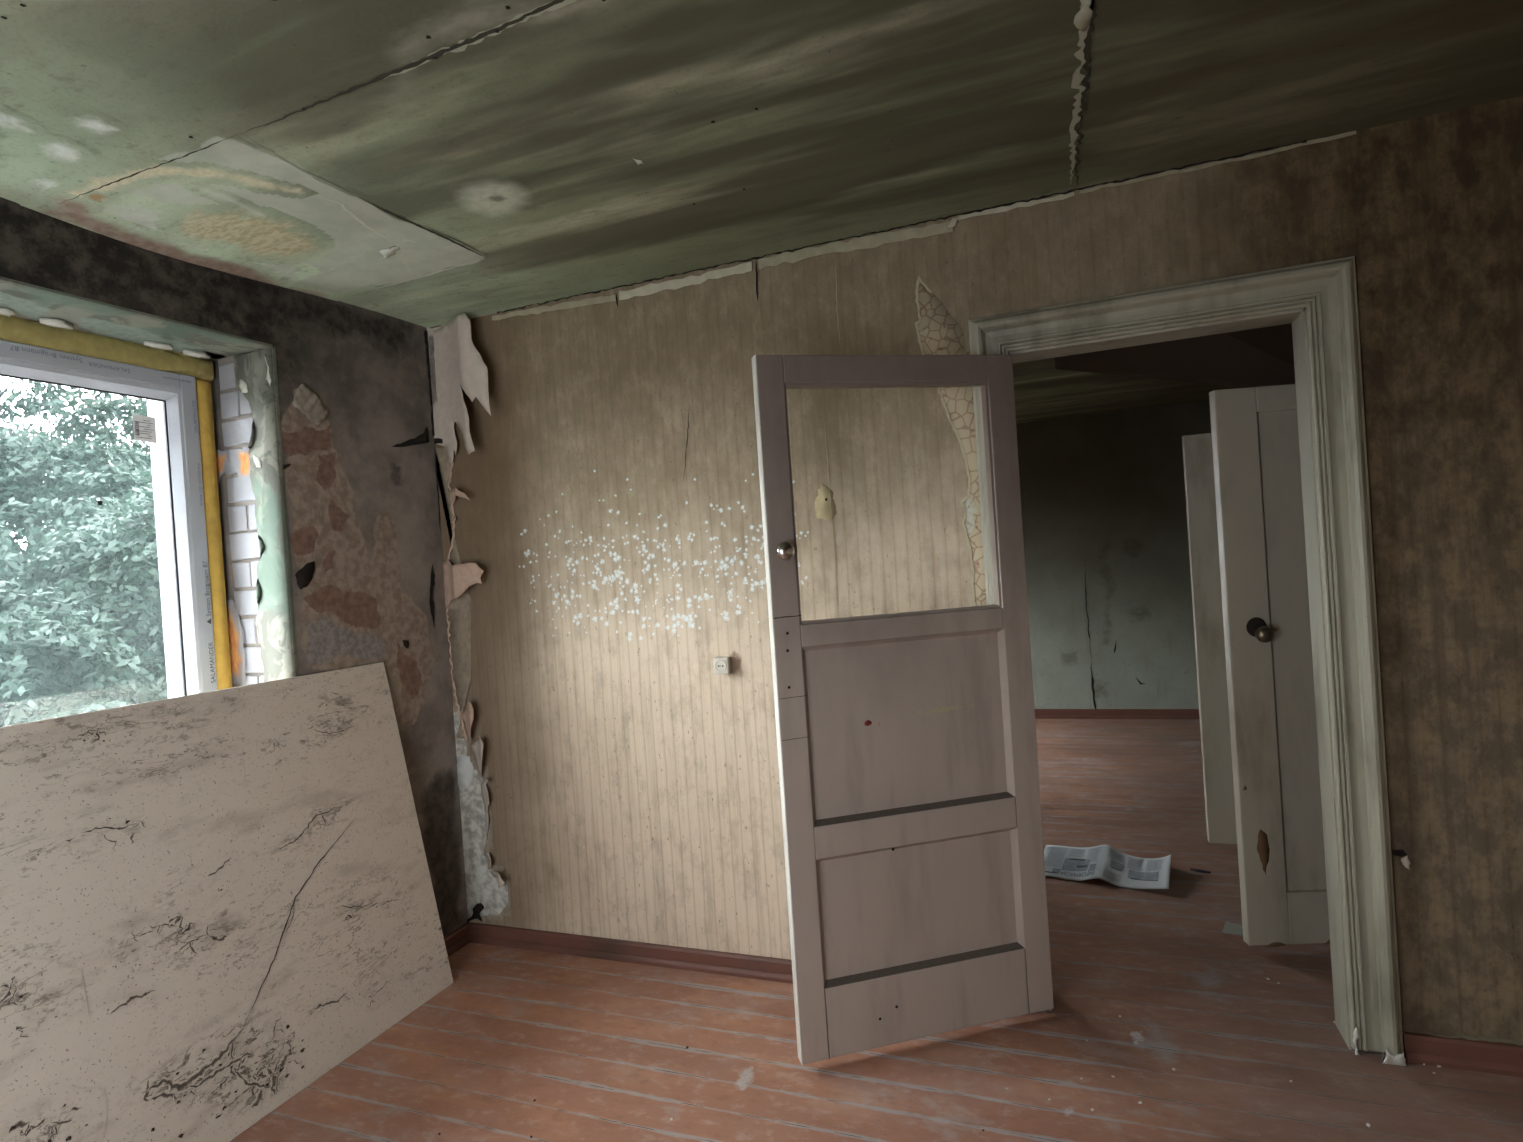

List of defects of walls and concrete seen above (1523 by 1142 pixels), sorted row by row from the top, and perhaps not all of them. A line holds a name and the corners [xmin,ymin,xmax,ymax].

crack [60,0,695,257]
crack [497,0,1307,313]
flaking render [0,288,471,740]
water stain [518,478,766,642]
crack [1085,565,1145,709]